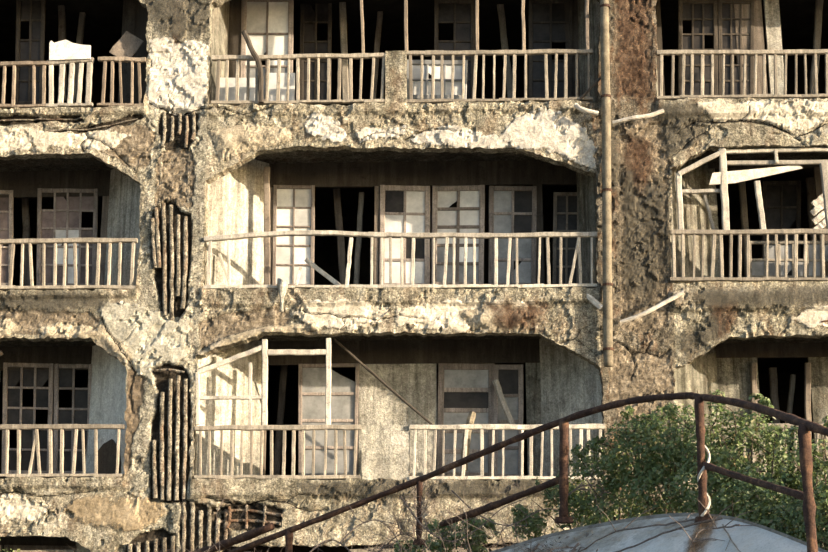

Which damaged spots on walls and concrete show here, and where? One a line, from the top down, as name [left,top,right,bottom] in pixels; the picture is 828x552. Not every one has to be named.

rust [613,0,656,104]
peeling [305,107,597,169]
crack [671,106,827,157]
spalling [0,37,546,552]
peeling [790,305,828,328]
rust [687,516,715,552]